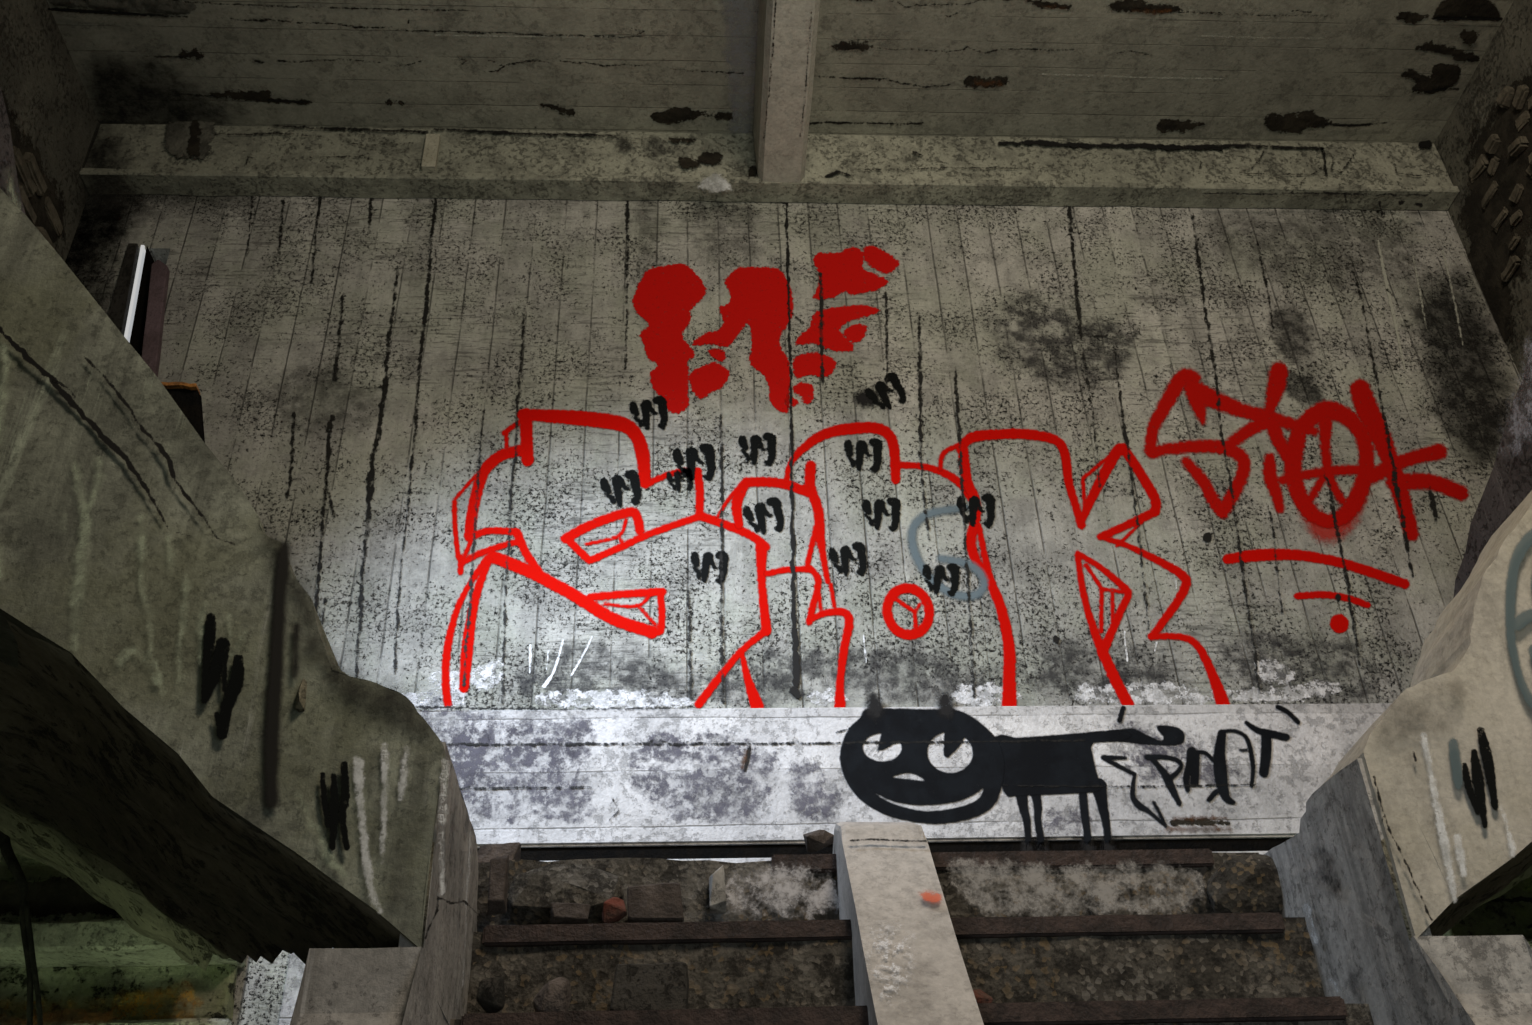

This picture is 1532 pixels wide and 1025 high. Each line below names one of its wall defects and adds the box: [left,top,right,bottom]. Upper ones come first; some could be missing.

spalling [1108,0,1182,15]
spalling [1394,0,1502,95]
spalling [963,75,1009,89]
spalling [650,107,733,169]
spalling [1263,110,1387,135]
damp [999,295,1131,384]
crack [0,327,235,545]